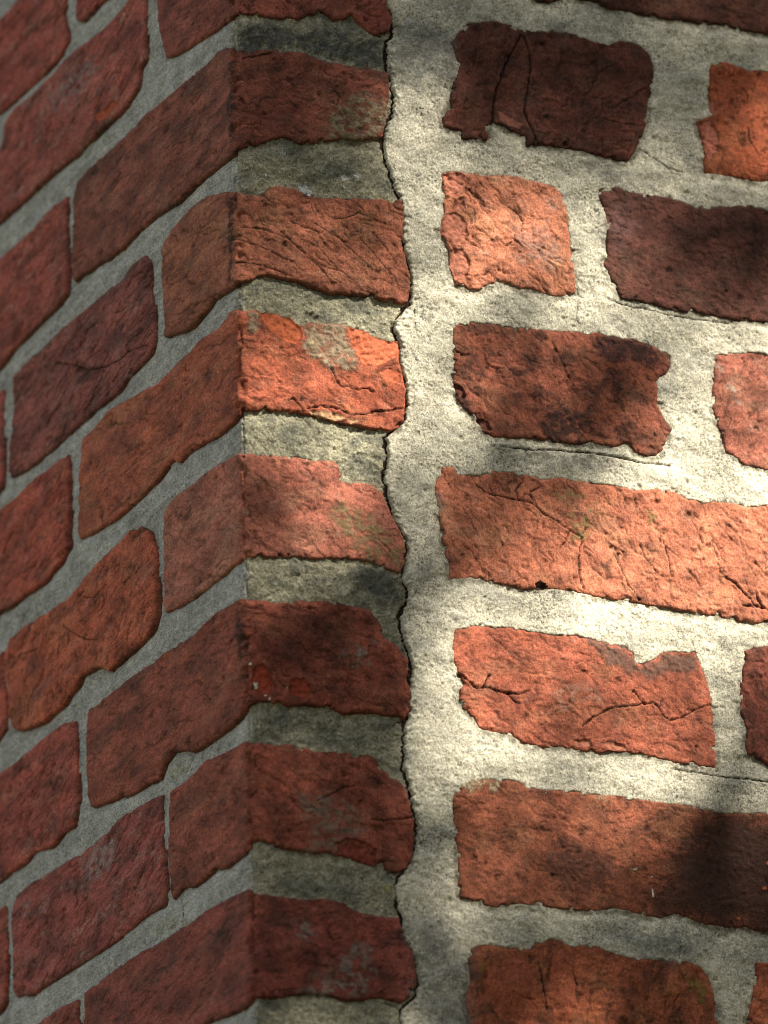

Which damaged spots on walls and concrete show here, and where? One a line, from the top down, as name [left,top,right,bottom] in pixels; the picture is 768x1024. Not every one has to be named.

crack [380,10,400,200]
crack [492,37,535,139]
crack [238,212,416,350]
crack [513,447,667,466]
crack [288,368,417,933]
crack [460,675,529,704]
crack [582,692,701,727]
crack [381,958,419,1024]